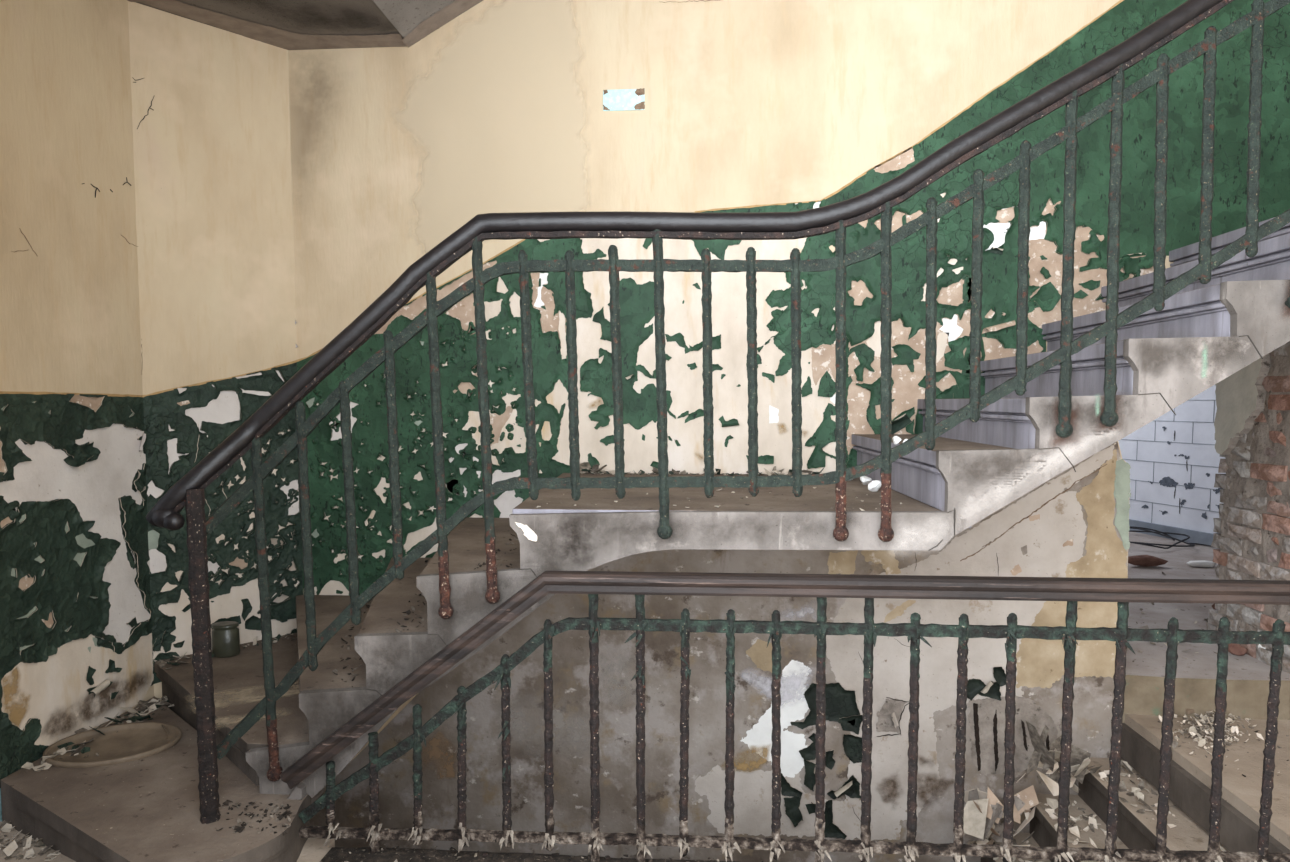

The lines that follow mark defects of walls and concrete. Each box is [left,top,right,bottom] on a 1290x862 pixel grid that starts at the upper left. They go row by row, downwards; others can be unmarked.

peeling [207,188,1154,644]
flaking render [827,341,1290,580]
peeling [0,367,287,754]
flaking render [1207,604,1290,674]
damp [3,668,28,726]
damp [47,674,145,734]
flaking render [695,598,1118,862]
peeling [324,823,341,845]
peeling [458,827,470,853]
peeling [499,830,514,850]
peeling [542,833,556,849]
peeling [678,837,690,859]